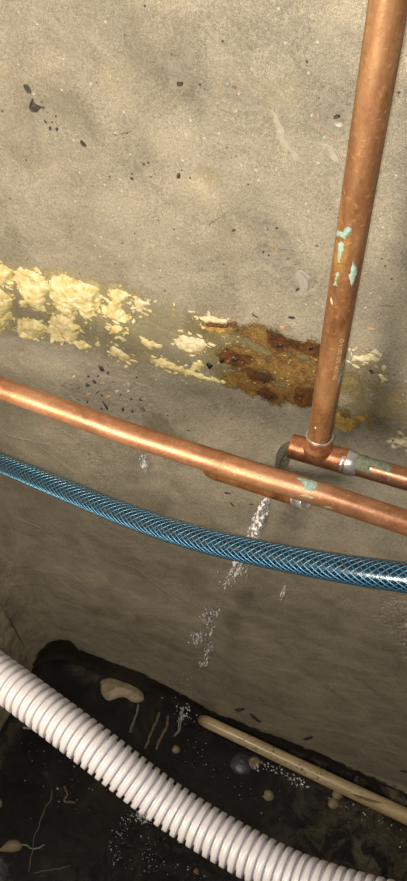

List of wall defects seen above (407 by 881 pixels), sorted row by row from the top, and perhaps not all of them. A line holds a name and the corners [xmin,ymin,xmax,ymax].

water stain [0,260,230,384]
corrosion [189,319,320,407]
water stain [346,347,389,383]
water stain [386,429,407,452]